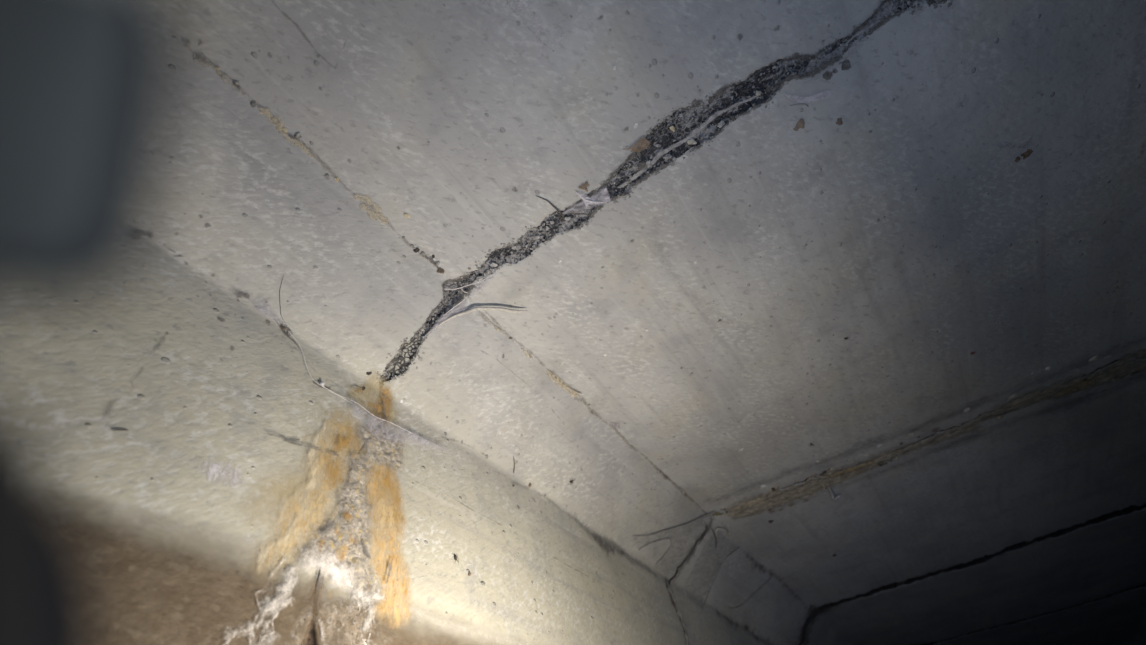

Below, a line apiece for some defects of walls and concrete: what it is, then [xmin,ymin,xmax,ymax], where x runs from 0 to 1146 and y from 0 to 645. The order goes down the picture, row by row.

crack [269,0,952,482]
leakage [64,422,473,645]
corrosion [263,419,367,563]
corrosion [352,378,395,428]
corrosion [366,463,409,624]
crack [664,411,998,644]